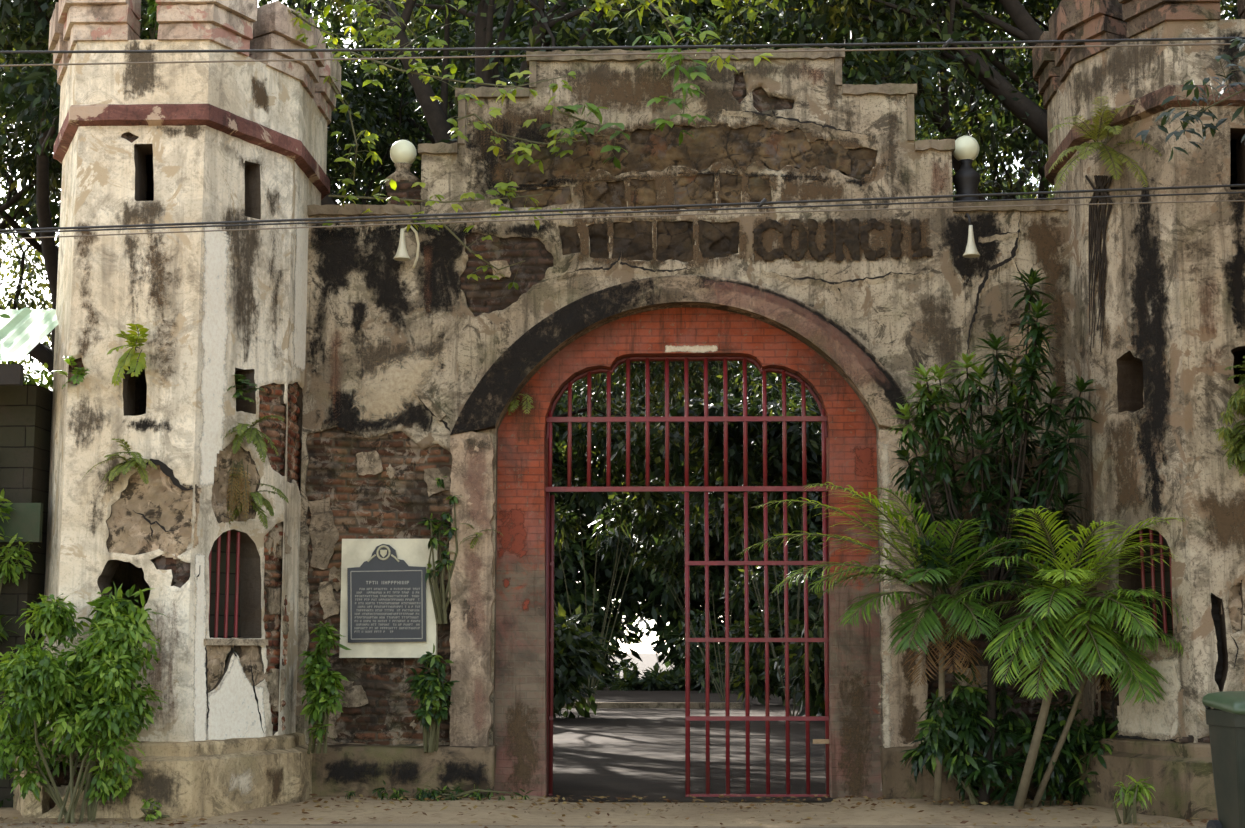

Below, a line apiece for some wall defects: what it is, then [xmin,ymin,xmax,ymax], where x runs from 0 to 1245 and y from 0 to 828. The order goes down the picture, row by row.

damp [123,41,164,98]
damp [222,208,282,362]
flaking render [106,221,453,745]
damp [316,390,436,436]
damp [307,220,549,378]
flaking render [460,73,877,317]
damp [450,60,1001,453]
damp [1094,232,1110,349]
damp [1107,179,1171,519]
damp [1225,191,1245,332]
damp [463,600,477,629]